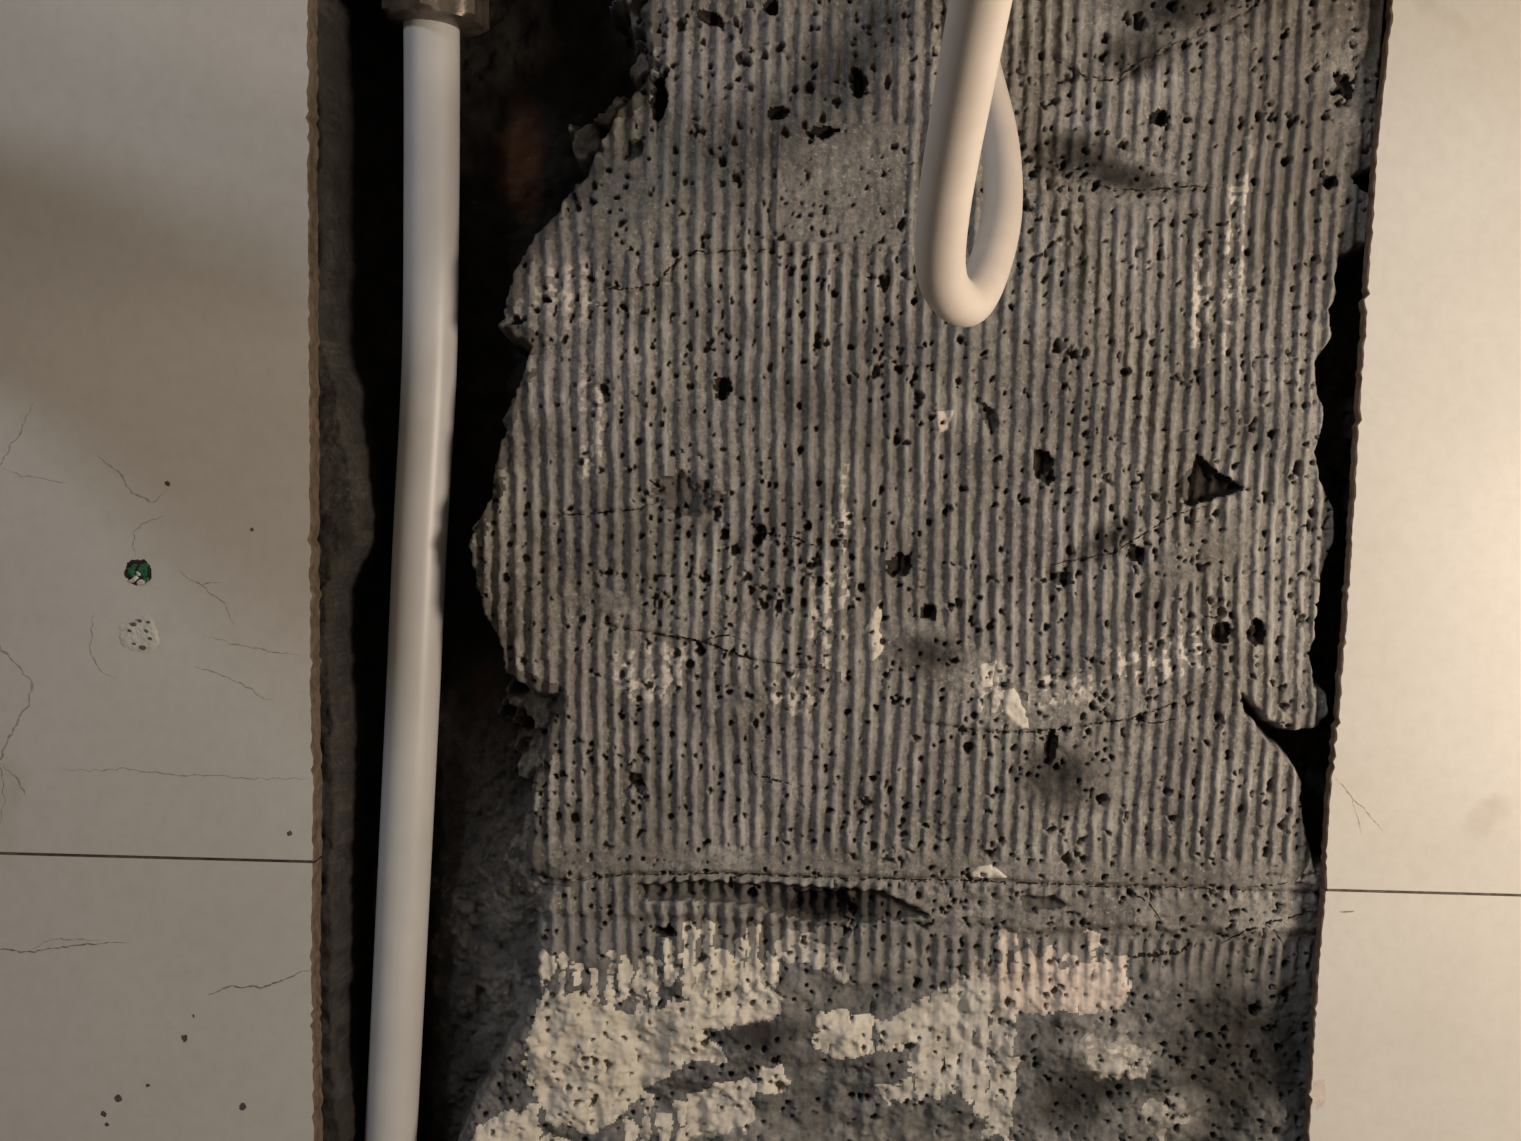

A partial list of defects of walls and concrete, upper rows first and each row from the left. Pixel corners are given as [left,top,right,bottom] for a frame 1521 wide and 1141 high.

spalling [614,0,669,122]
crack [1055,38,1188,82]
spalling [1149,108,1171,127]
spalling [1033,449,1055,486]
spalling [469,136,645,887]
peeling [866,606,884,661]
spalling [1211,618,1266,646]
peeling [979,660,1058,765]
crack [963,683,1204,734]
spalling [536,879,928,1013]
peeling [966,928,1129,986]
peeling [640,1077,757,1141]